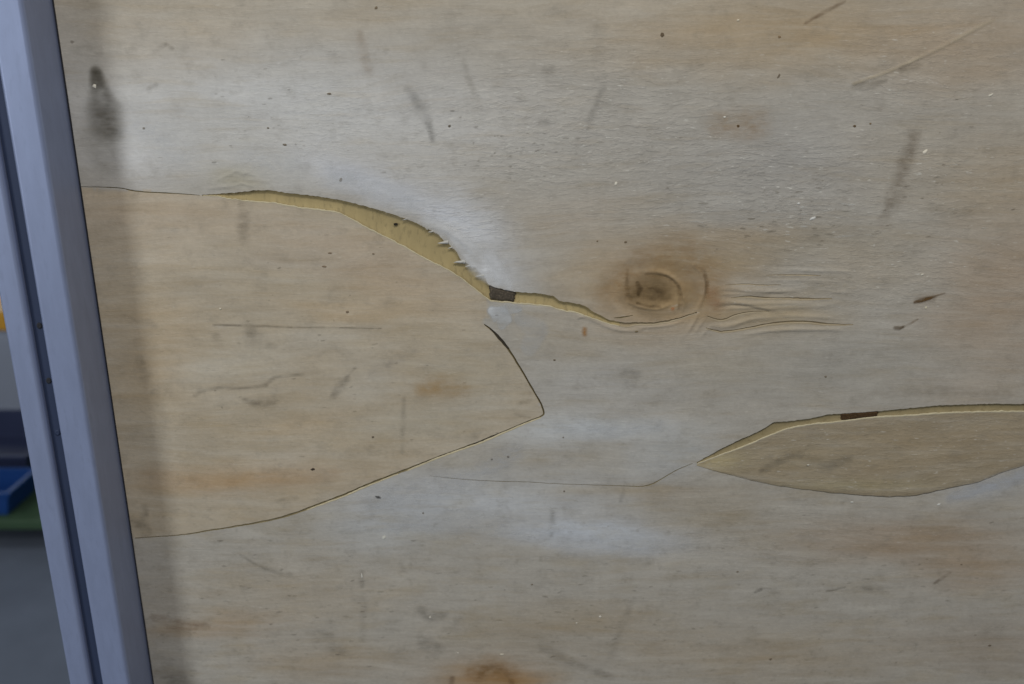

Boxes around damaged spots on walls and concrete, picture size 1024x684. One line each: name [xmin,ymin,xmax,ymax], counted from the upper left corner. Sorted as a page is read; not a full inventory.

crack [82,186,697,538]
peeling [697,404,1024,497]